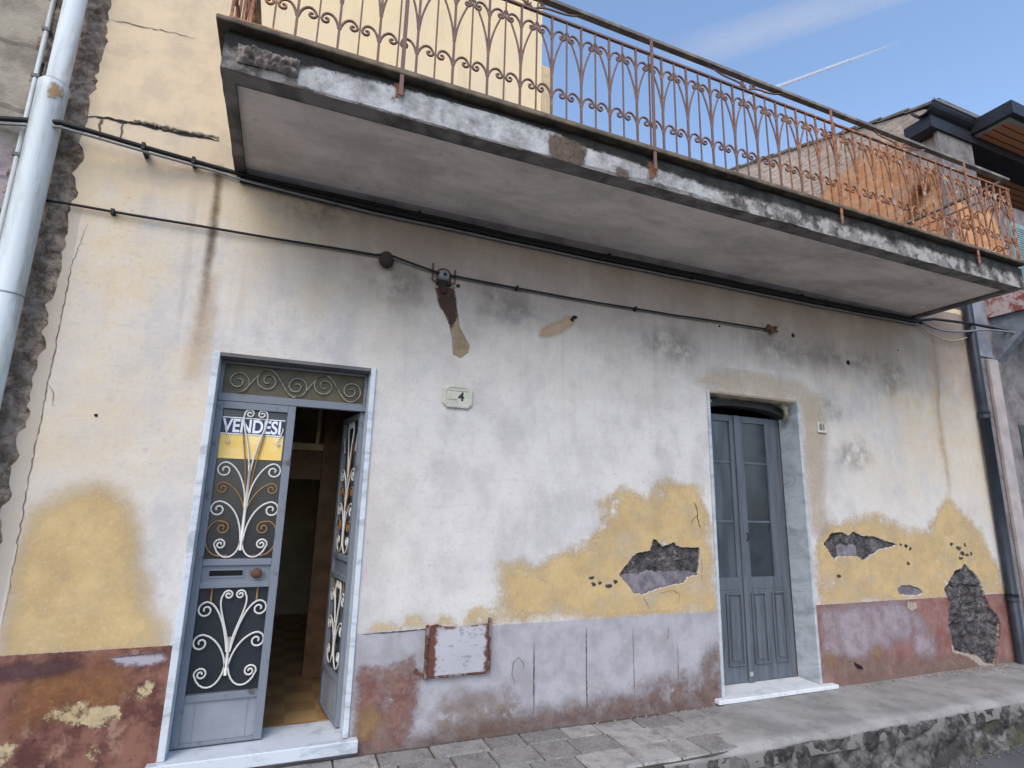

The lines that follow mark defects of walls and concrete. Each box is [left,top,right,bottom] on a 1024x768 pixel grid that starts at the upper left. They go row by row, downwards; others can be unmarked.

crack [114,20,189,37]
crack [87,116,219,141]
peeling [236,43,723,202]
water stain [206,174,220,263]
peeling [1,489,162,656]
peeling [440,480,717,625]
peeling [817,500,1004,670]
water stain [438,651,720,741]